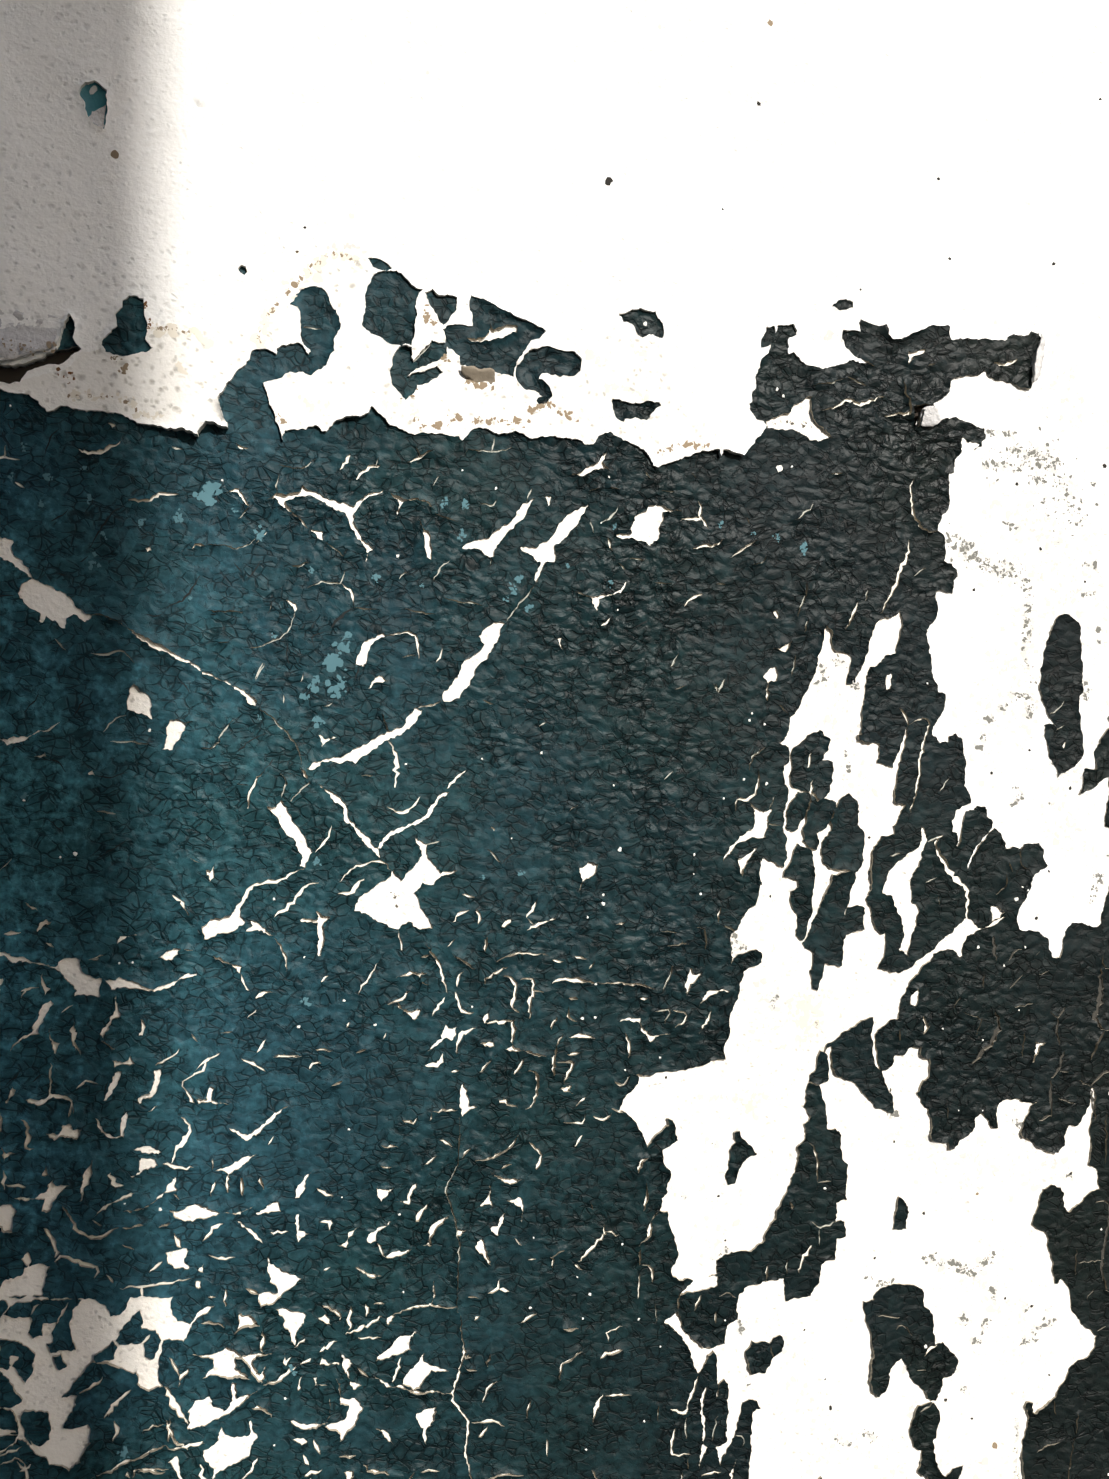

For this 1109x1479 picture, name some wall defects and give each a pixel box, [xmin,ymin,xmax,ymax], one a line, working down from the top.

spalling [362,258,581,404]
crack [0,423,119,488]
spalling [616,505,682,545]
crack [590,473,764,606]
crack [847,481,934,626]
crack [56,450,533,814]
crack [735,749,777,825]
spalling [620,612,1109,1479]
crack [765,1221,834,1276]
spalling [0,1248,211,1469]
spalling [173,1174,330,1479]
spalling [377,1315,446,1443]